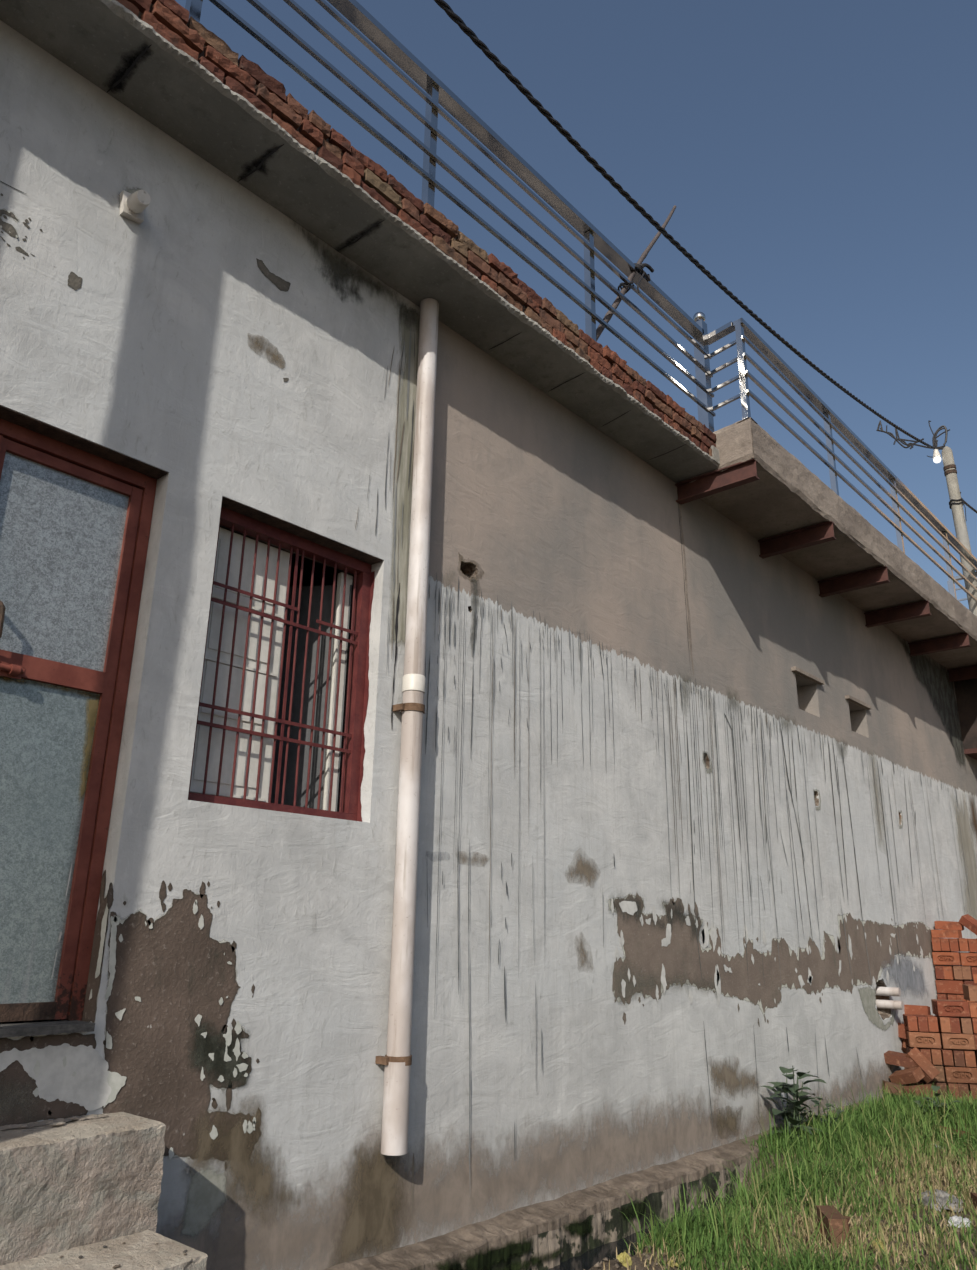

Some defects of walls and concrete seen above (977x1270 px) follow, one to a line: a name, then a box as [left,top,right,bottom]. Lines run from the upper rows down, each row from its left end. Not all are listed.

peeling [0,193,43,259]
peeling [256,258,291,291]
peeling [0,870,261,1171]
water stain [161,573,977,1270]
peeling [608,893,942,1030]